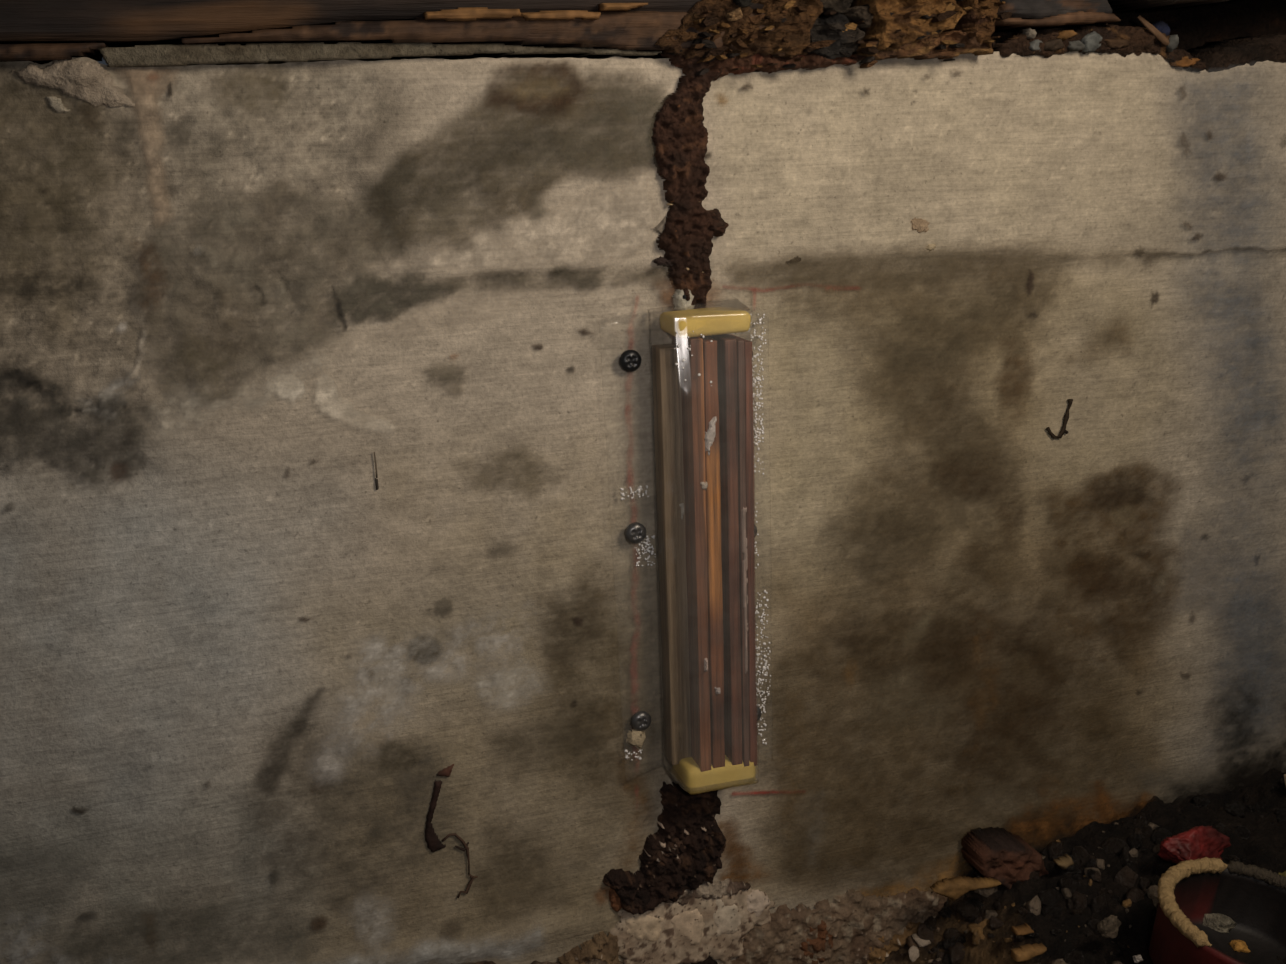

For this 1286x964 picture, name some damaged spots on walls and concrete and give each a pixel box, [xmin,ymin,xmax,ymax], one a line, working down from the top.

damp [98,42,663,332]
damp [0,330,147,478]
damp [152,358,395,434]
damp [787,467,1170,873]
damp [1148,712,1286,805]